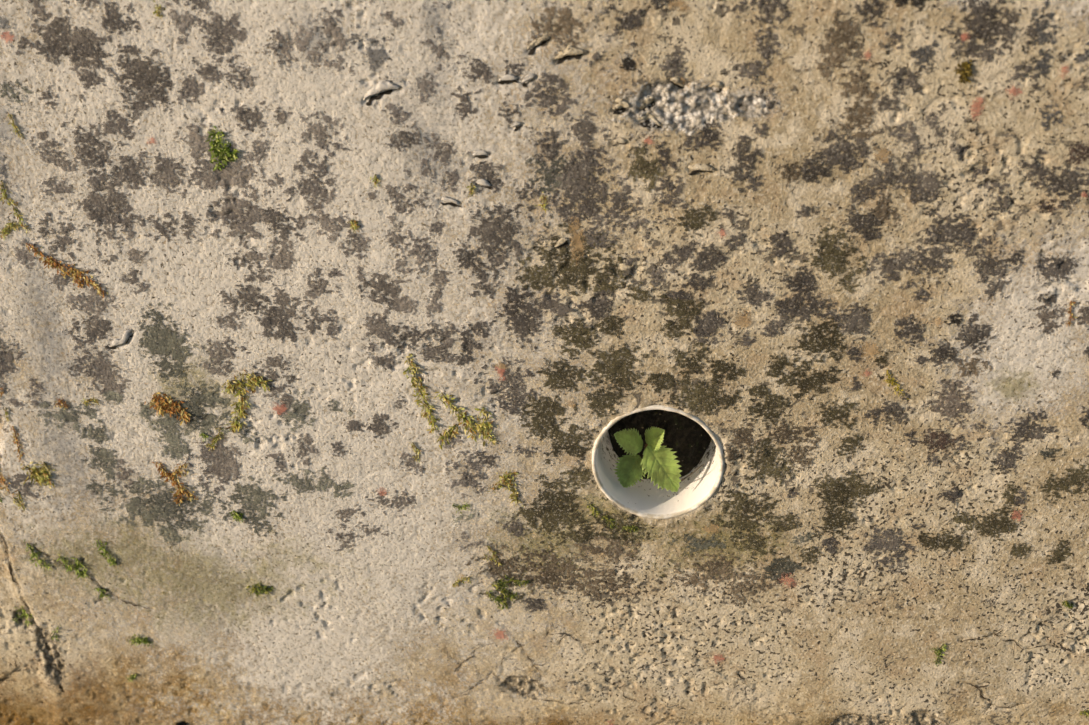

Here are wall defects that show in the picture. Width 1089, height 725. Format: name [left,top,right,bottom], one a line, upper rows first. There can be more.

spalling [604,74,776,138]
damp [0,0,601,725]
crack [0,533,64,693]
crack [36,549,152,609]